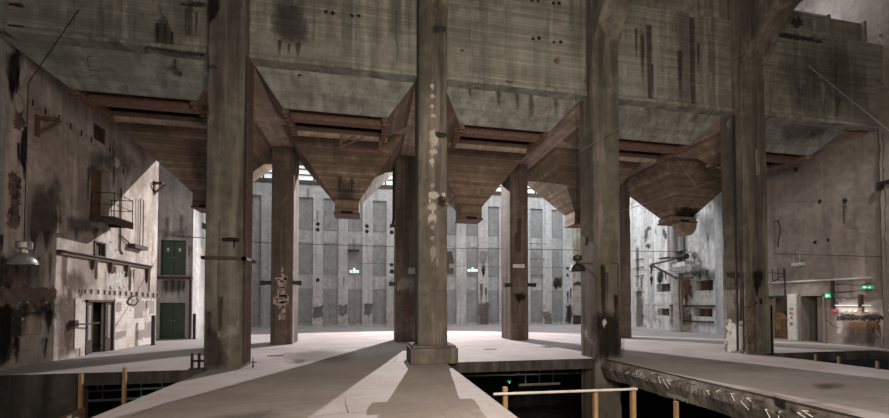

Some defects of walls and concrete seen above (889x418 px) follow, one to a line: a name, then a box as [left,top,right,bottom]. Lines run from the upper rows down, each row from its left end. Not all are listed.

water stain [7,50,25,118]
water stain [255,5,341,58]
water stain [622,25,660,99]
water stain [0,233,84,299]
water stain [42,310,53,355]
peeling [644,302,743,352]